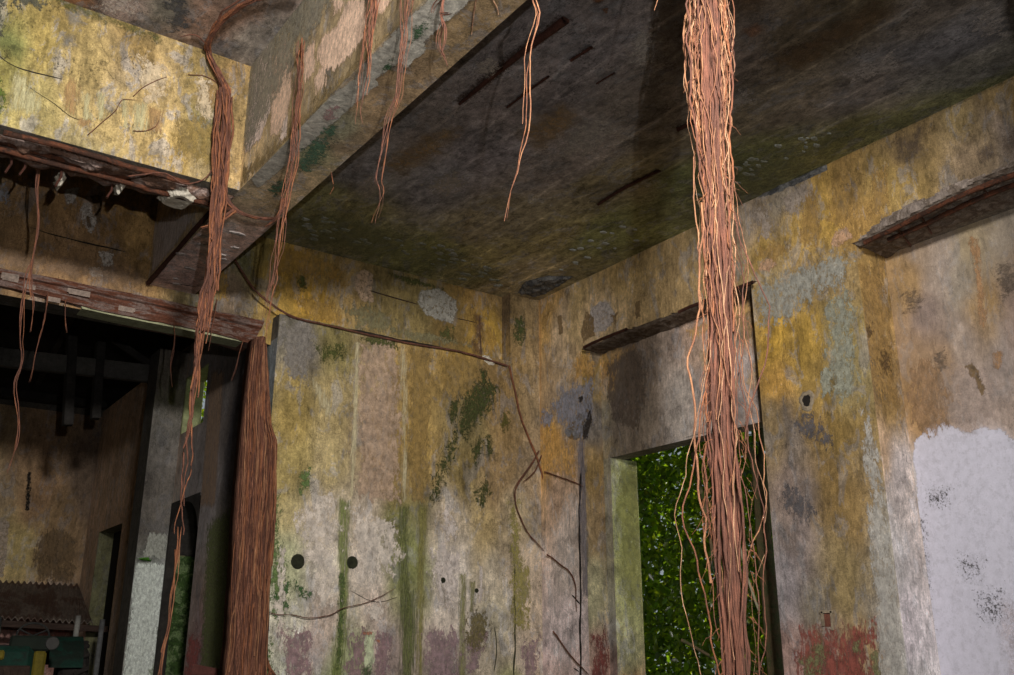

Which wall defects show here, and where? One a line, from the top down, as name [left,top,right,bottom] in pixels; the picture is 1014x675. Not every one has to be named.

spalling [0,130,211,285]
leakage [290,294,482,504]
spalling [540,298,708,484]
spalling [733,160,1014,412]